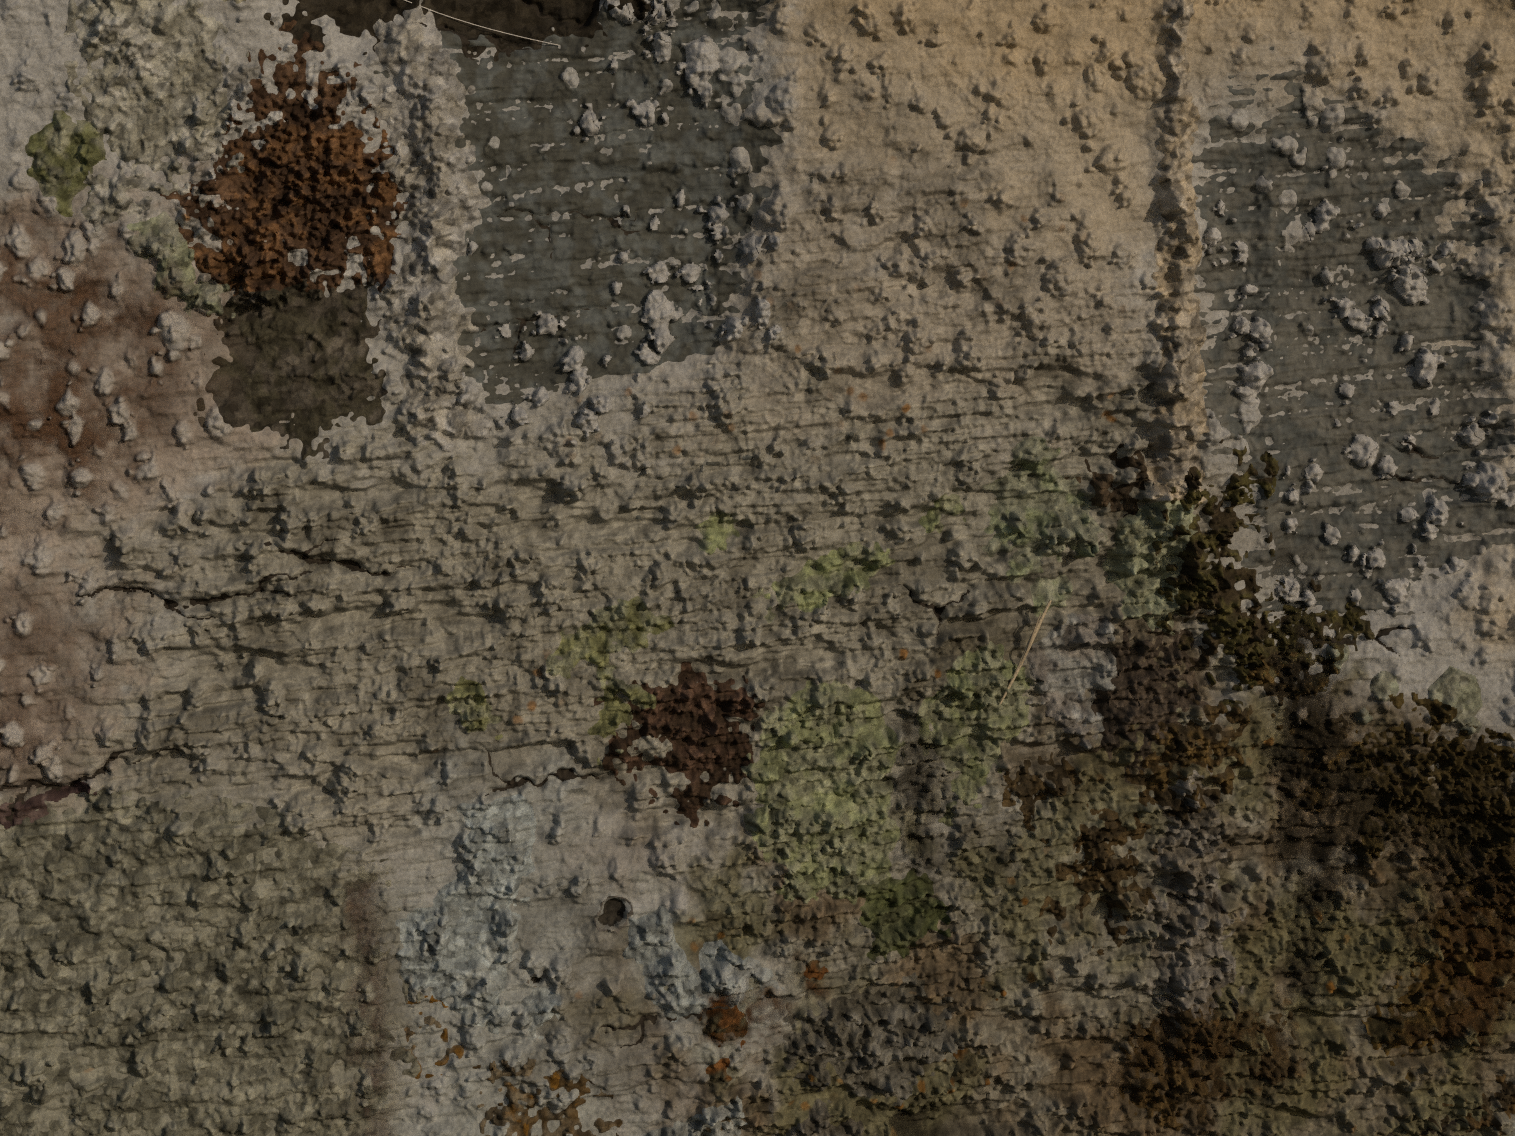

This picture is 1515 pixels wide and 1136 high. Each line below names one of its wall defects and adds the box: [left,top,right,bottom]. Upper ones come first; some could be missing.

crack [77,538,406,622]